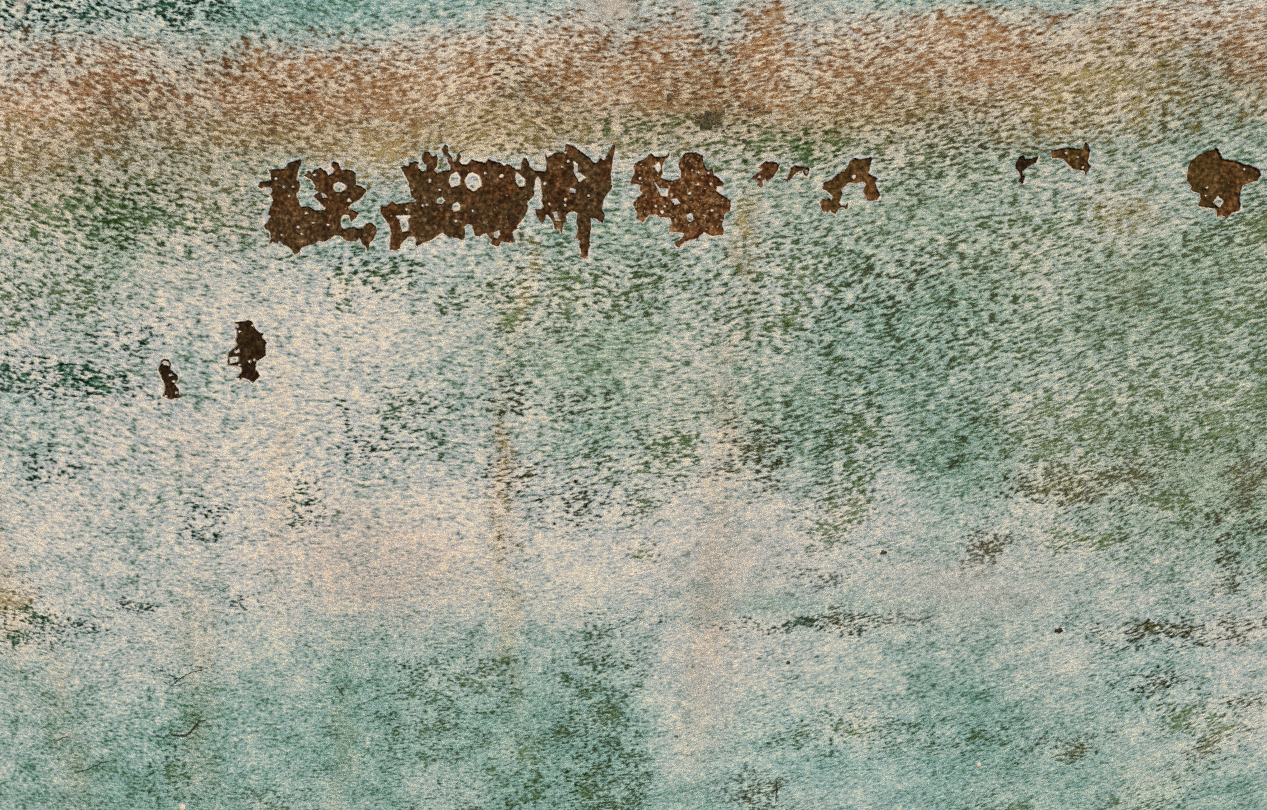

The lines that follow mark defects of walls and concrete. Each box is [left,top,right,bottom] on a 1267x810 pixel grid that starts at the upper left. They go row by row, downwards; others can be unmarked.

rust [0,0,1267,181]
peeling [257,142,616,259]
peeling [629,152,732,250]
peeling [750,157,881,217]
peeling [1013,141,1092,185]
peeling [1185,147,1262,220]
peeling [156,358,183,401]
peeling [226,320,268,386]